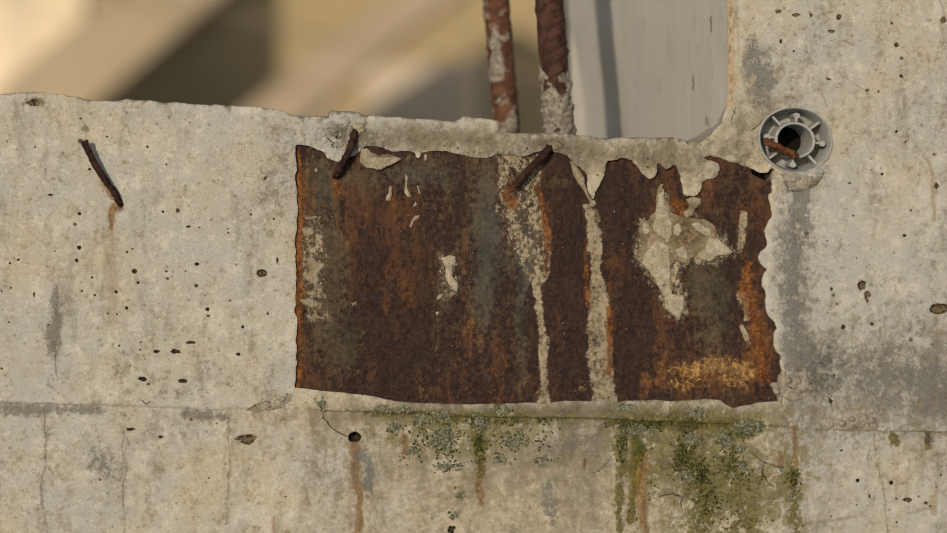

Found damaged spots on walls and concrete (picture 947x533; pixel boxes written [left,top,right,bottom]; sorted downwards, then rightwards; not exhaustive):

corrosion [100,179,118,230]
peeling [360,148,401,170]
peeling [404,174,420,227]
peeling [570,161,596,207]
corrosion [295,152,305,378]
peeling [299,214,329,322]
peeling [437,255,458,300]
peeling [634,184,736,321]
corrosion [668,262,768,392]